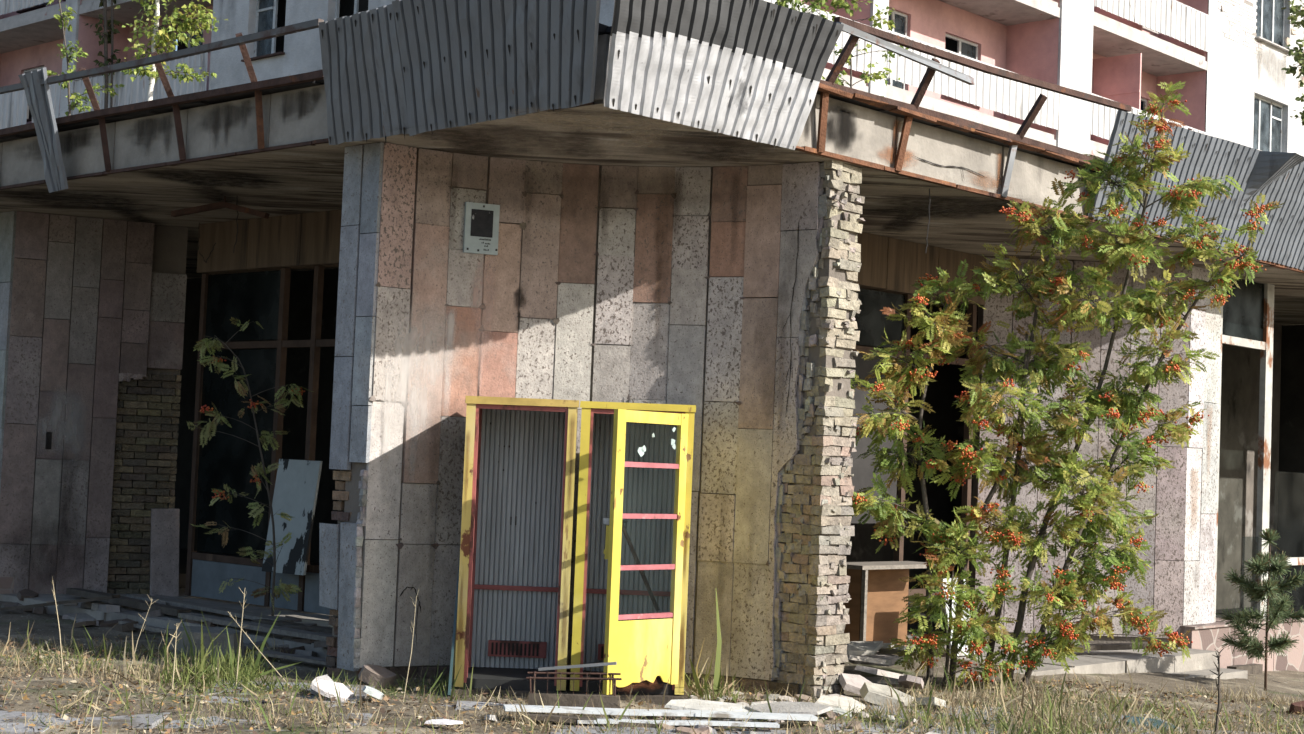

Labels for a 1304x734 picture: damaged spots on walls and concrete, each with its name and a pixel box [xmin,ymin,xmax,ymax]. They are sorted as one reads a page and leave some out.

damp [826,107,856,147]
damp [150,170,266,202]
spalling [107,373,182,594]